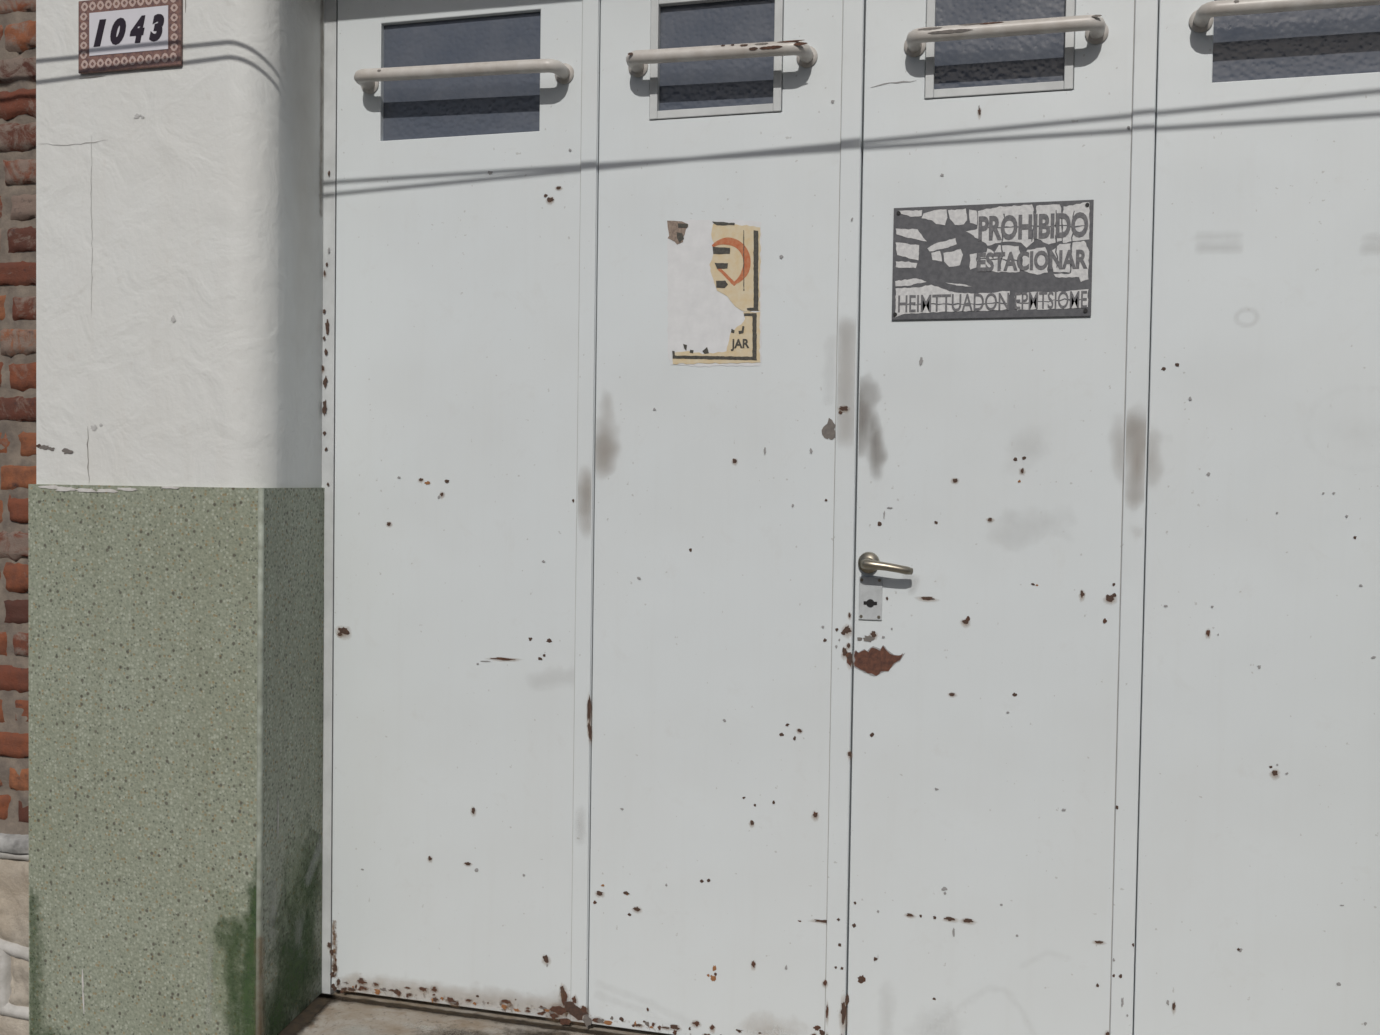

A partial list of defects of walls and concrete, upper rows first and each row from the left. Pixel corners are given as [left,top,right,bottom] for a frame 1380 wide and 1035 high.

corrosion [846,645,905,676]
corrosion [327,921,715,1035]